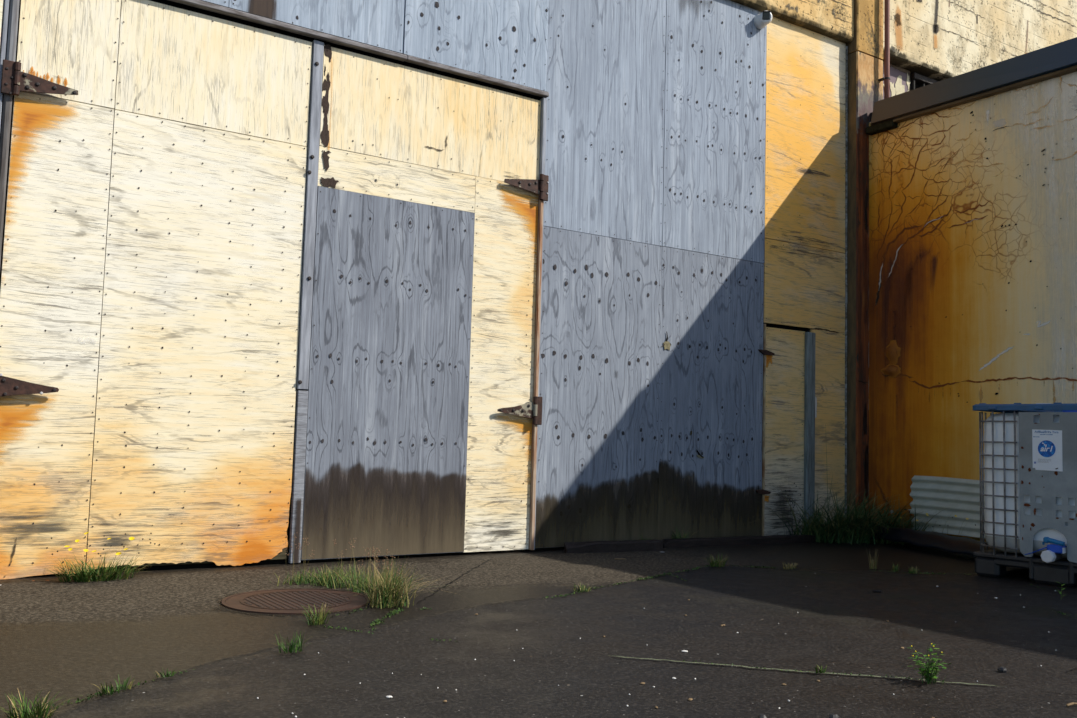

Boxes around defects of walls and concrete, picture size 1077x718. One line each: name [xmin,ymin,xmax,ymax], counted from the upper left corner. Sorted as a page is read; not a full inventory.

damp [248,0,276,19]
rust [23,66,67,86]
peeling [321,44,339,188]
rust [6,98,76,222]
rust [498,182,538,265]
crack [872,77,1077,306]
rust [869,82,1077,531]
rust [0,397,52,452]
crack [897,374,1077,403]
damp [293,463,466,563]
damp [535,461,762,548]